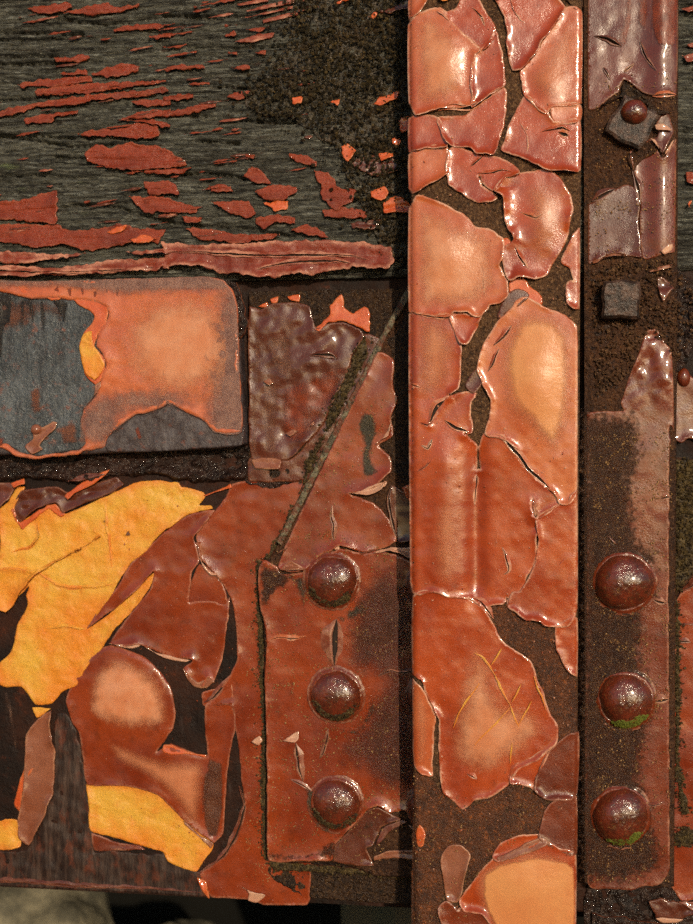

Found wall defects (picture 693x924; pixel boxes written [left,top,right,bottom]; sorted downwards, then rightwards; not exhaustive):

crack [473,8,485,26]
rust [619,0,677,44]
crack [427,87,500,113]
crack [470,154,512,175]
crack [519,122,571,151]
peeling [601,81,674,172]
spalling [0,0,395,456]
crack [515,247,532,270]
peeling [649,244,674,301]
rust [285,372,341,439]
peeling [289,0,583,924]
peeling [0,477,236,899]